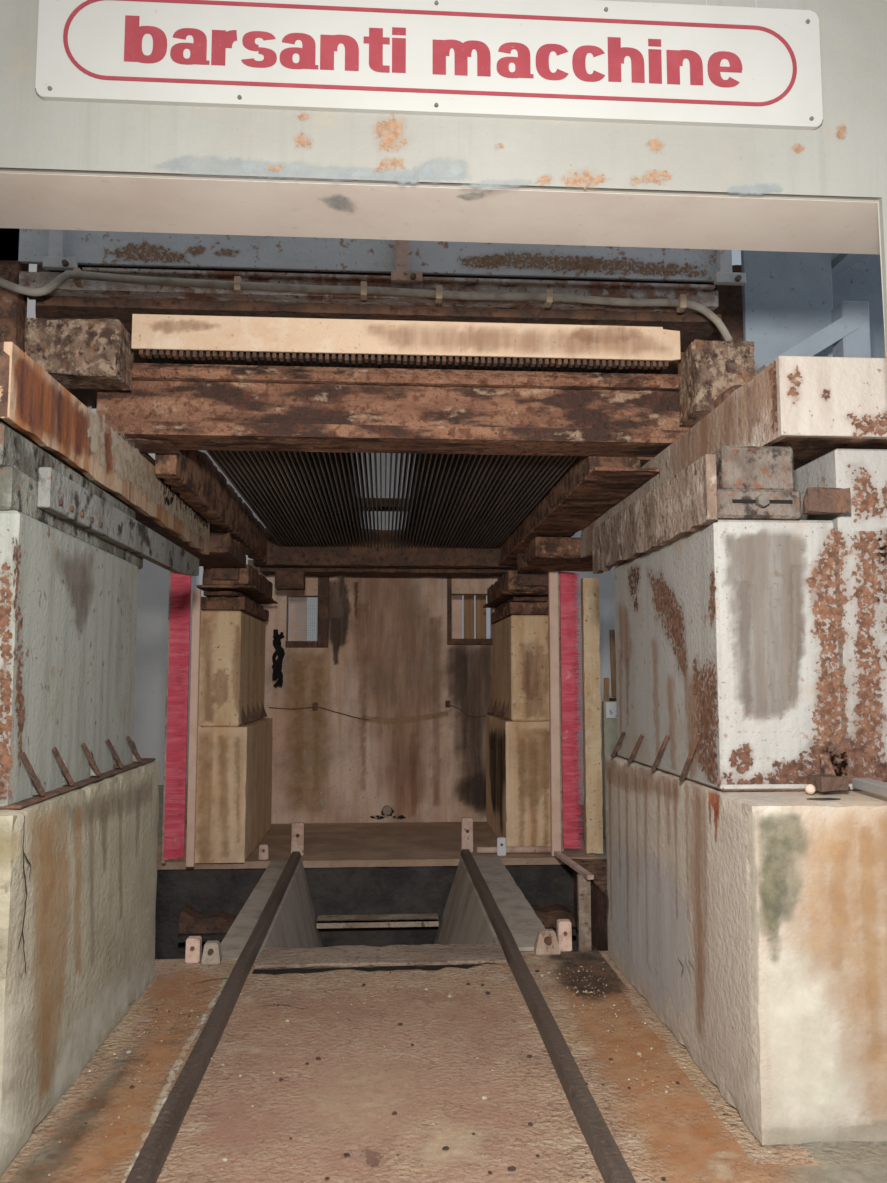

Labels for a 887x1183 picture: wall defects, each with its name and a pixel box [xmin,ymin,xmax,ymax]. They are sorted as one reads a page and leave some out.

corrosion [373,114,407,171]
corrosion [538,171,605,189]
corrosion [632,169,671,185]
corrosion [847,411,887,439]
corrosion [0,562,14,800]
corrosion [620,465,887,841]
damp [789,566,800,705]